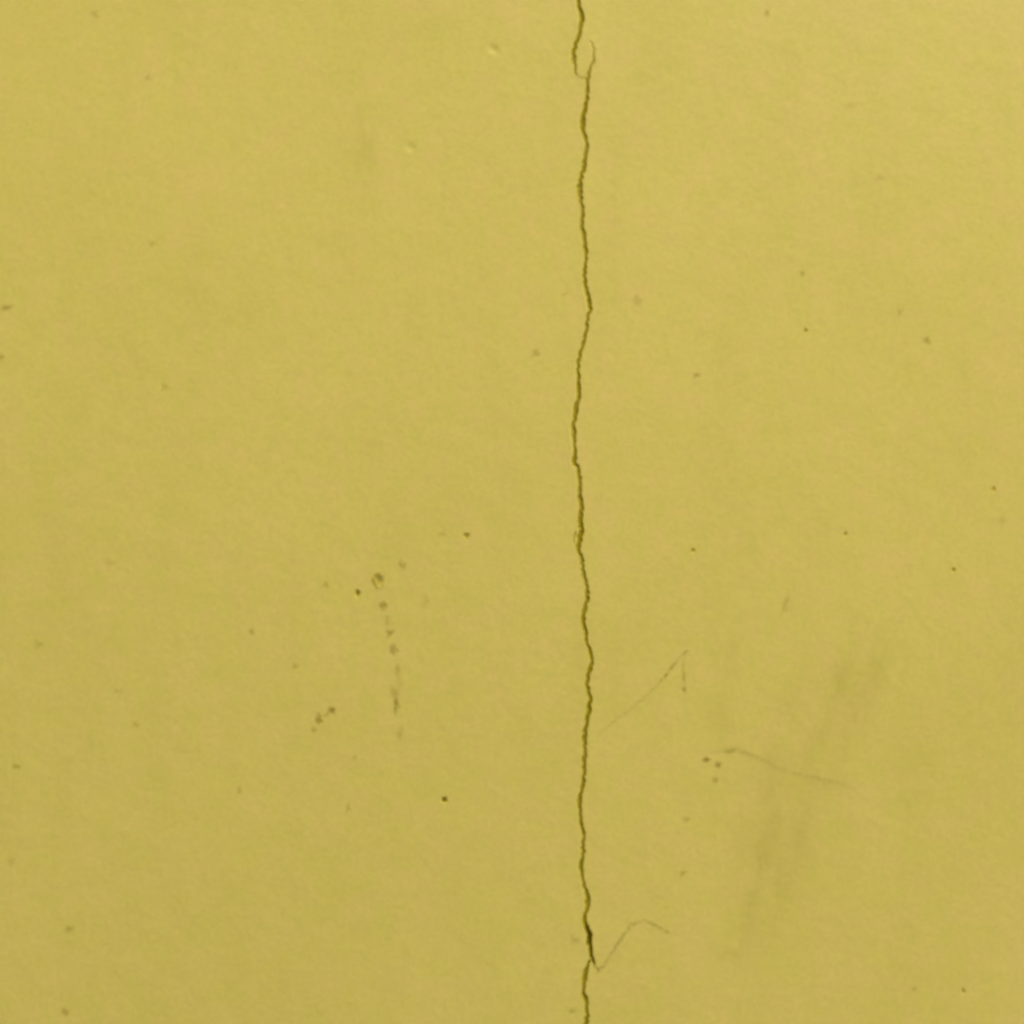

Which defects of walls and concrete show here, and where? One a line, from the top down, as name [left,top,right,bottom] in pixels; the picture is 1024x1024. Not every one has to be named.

crack [571,0,595,1024]